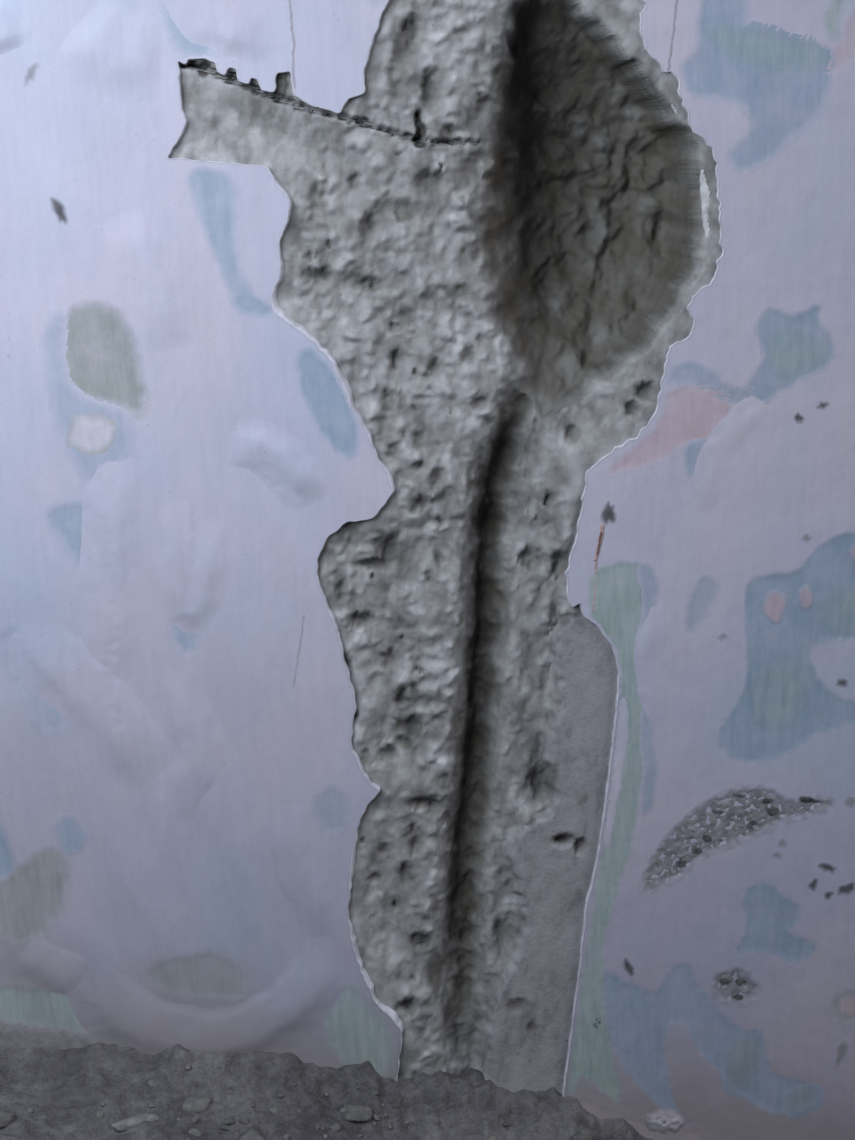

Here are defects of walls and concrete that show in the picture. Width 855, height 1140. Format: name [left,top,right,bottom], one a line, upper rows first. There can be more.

flaking render [155,0,838,1140]
peeling [807,861,855,901]
peeling [135,943,260,1009]